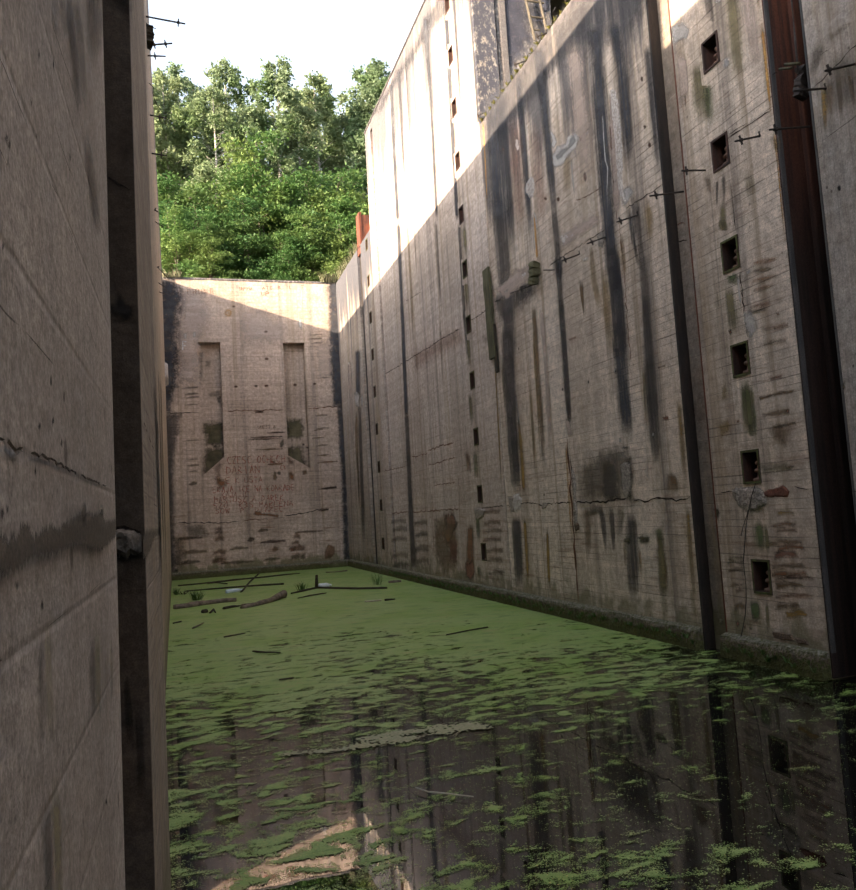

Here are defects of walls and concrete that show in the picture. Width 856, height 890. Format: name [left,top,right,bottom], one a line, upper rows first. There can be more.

leakage [644,50,659,158]
leakage [484,0,639,483]
leakage [629,203,658,451]
crack [0,437,106,495]
leakage [0,504,116,577]
leakage [162,279,207,572]
rust [435,510,504,580]
leakage [512,519,523,582]
crack [482,439,688,593]
leakage [583,447,634,547]
leakage [626,519,641,590]